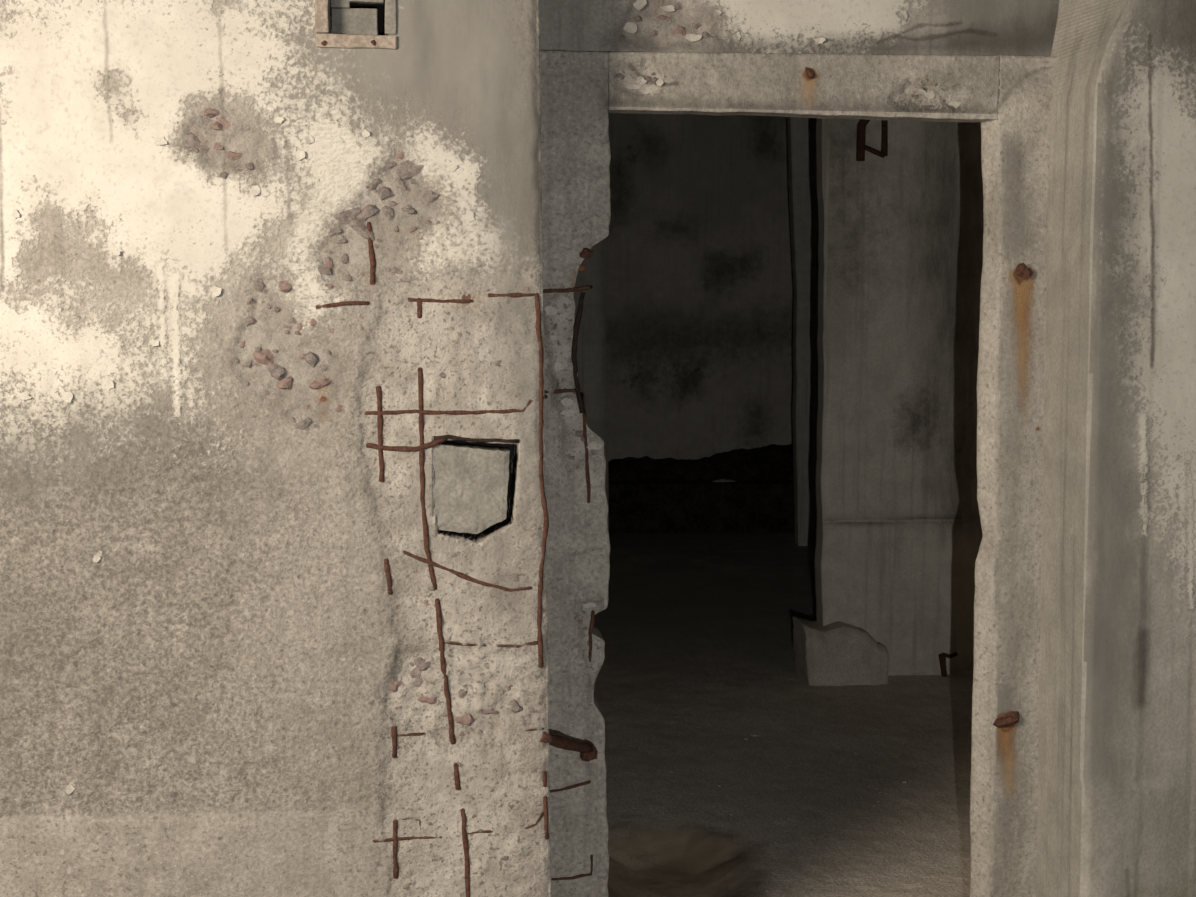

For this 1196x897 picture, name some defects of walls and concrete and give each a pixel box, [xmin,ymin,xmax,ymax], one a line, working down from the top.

peeling [609,0,929,99]
rust [1014,266,1031,379]
peeling [0,0,604,897]
spalling [607,827,759,897]